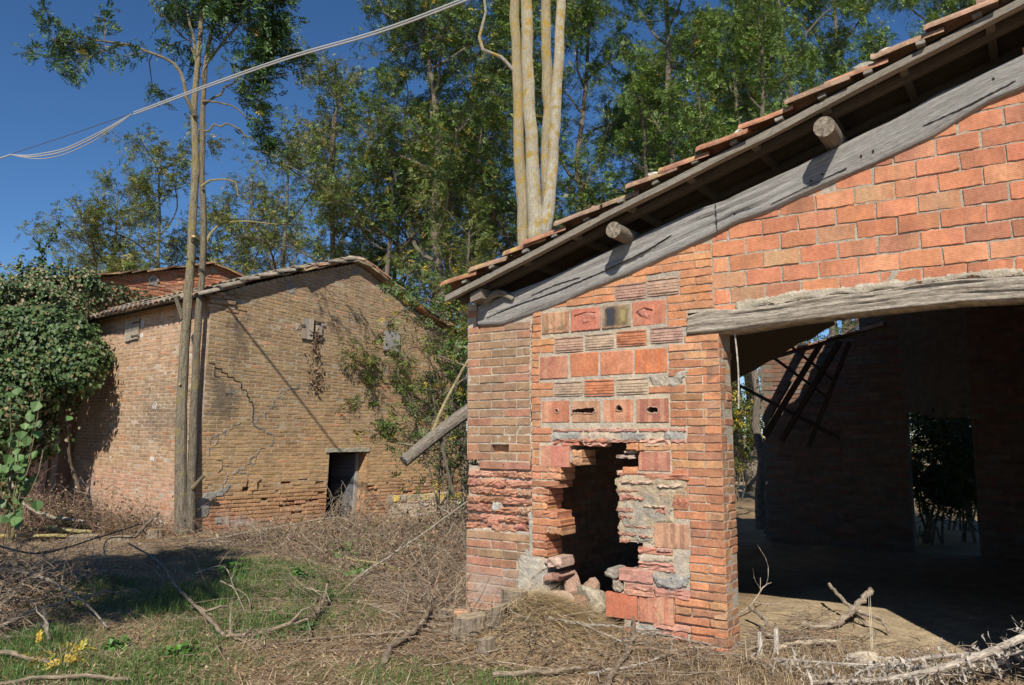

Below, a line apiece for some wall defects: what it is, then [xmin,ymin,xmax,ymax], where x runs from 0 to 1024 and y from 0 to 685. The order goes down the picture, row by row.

crack [209,362,299,493]
spalling [616,450,644,475]
spalling [466,469,532,532]
spalling [543,554,575,581]
spalling [605,565,626,592]